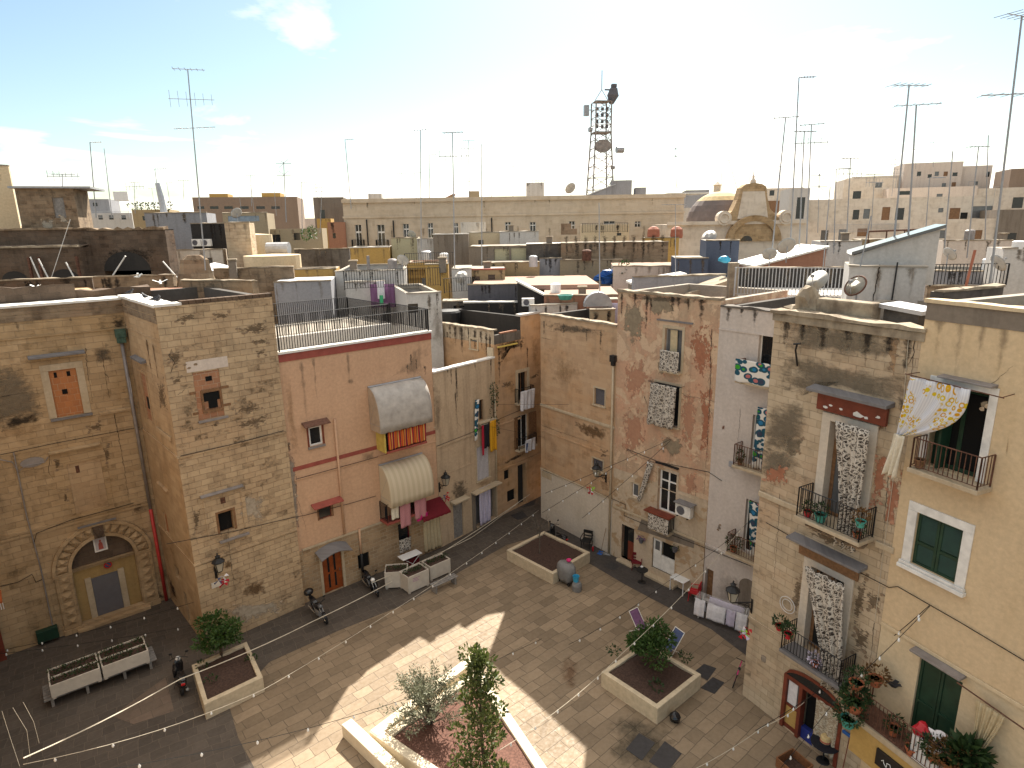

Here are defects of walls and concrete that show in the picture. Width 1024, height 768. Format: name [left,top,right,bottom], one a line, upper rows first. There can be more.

peeling [621,297,673,343]
leakage [784,322,892,355]
leakage [0,371,37,427]
peeling [622,354,666,460]
peeling [656,325,717,493]
leakage [763,407,802,473]
leakage [788,359,899,397]
spalling [868,446,902,525]